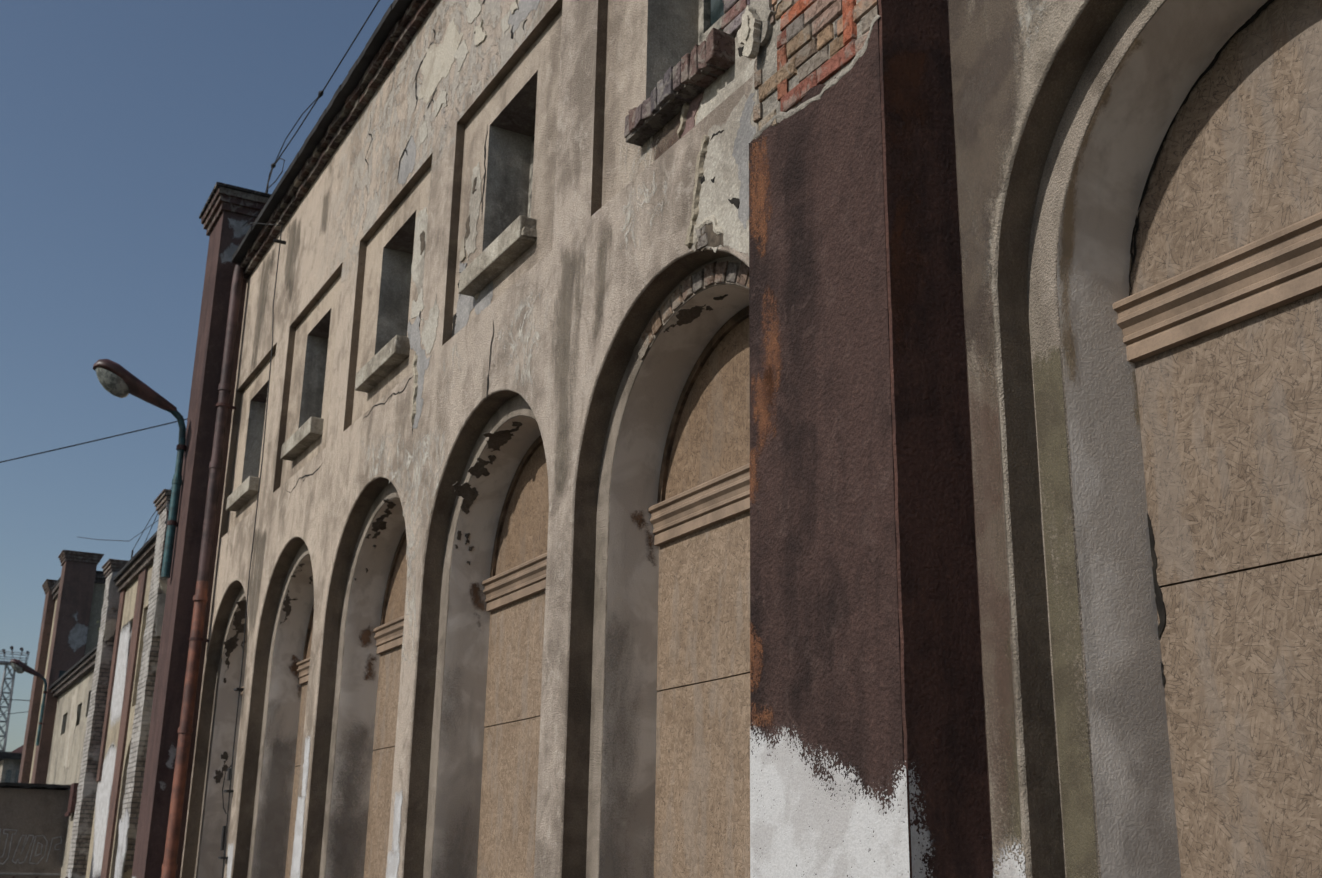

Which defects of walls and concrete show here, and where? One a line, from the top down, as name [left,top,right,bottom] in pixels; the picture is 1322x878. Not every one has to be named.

peeling [398,0,540,186]
spalling [633,0,880,359]
rust [749,137,772,257]
rust [750,286,782,501]
peeling [365,498,396,547]
peeling [452,422,523,514]
peeling [223,600,246,683]
rust [750,623,774,731]
crack [1147,513,1165,686]
peeling [213,751,229,784]
peeling [750,726,934,878]
peeling [992,838,1026,878]